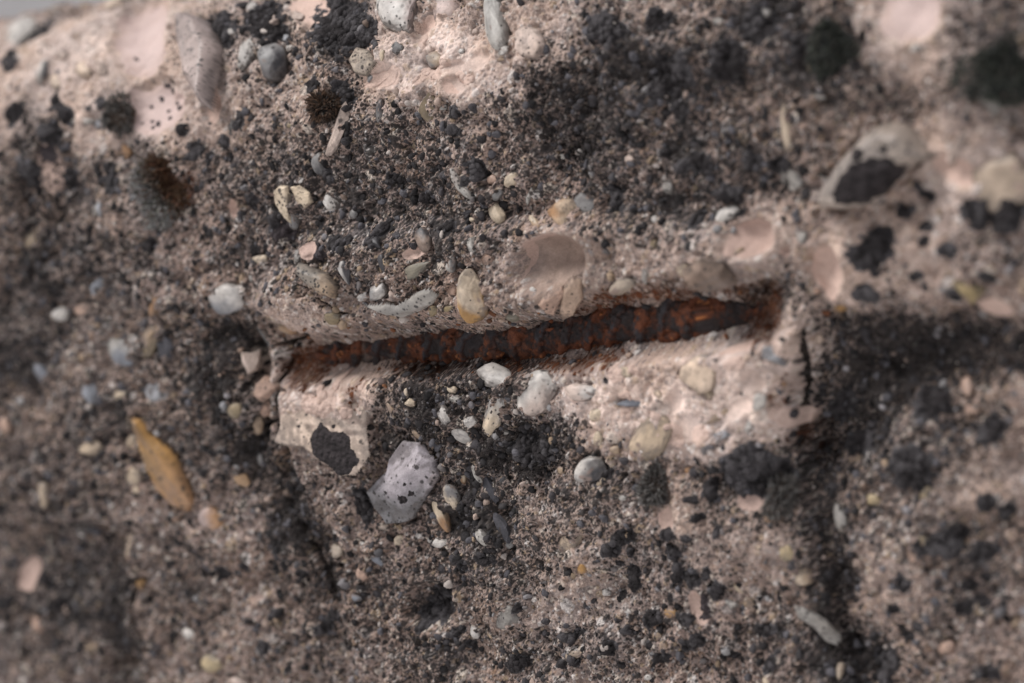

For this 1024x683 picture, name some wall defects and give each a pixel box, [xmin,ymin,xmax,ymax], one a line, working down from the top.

spalling [521,230,615,308]
corrosion [573,279,783,350]
corrosion [388,345,630,382]
spalling [278,297,822,466]